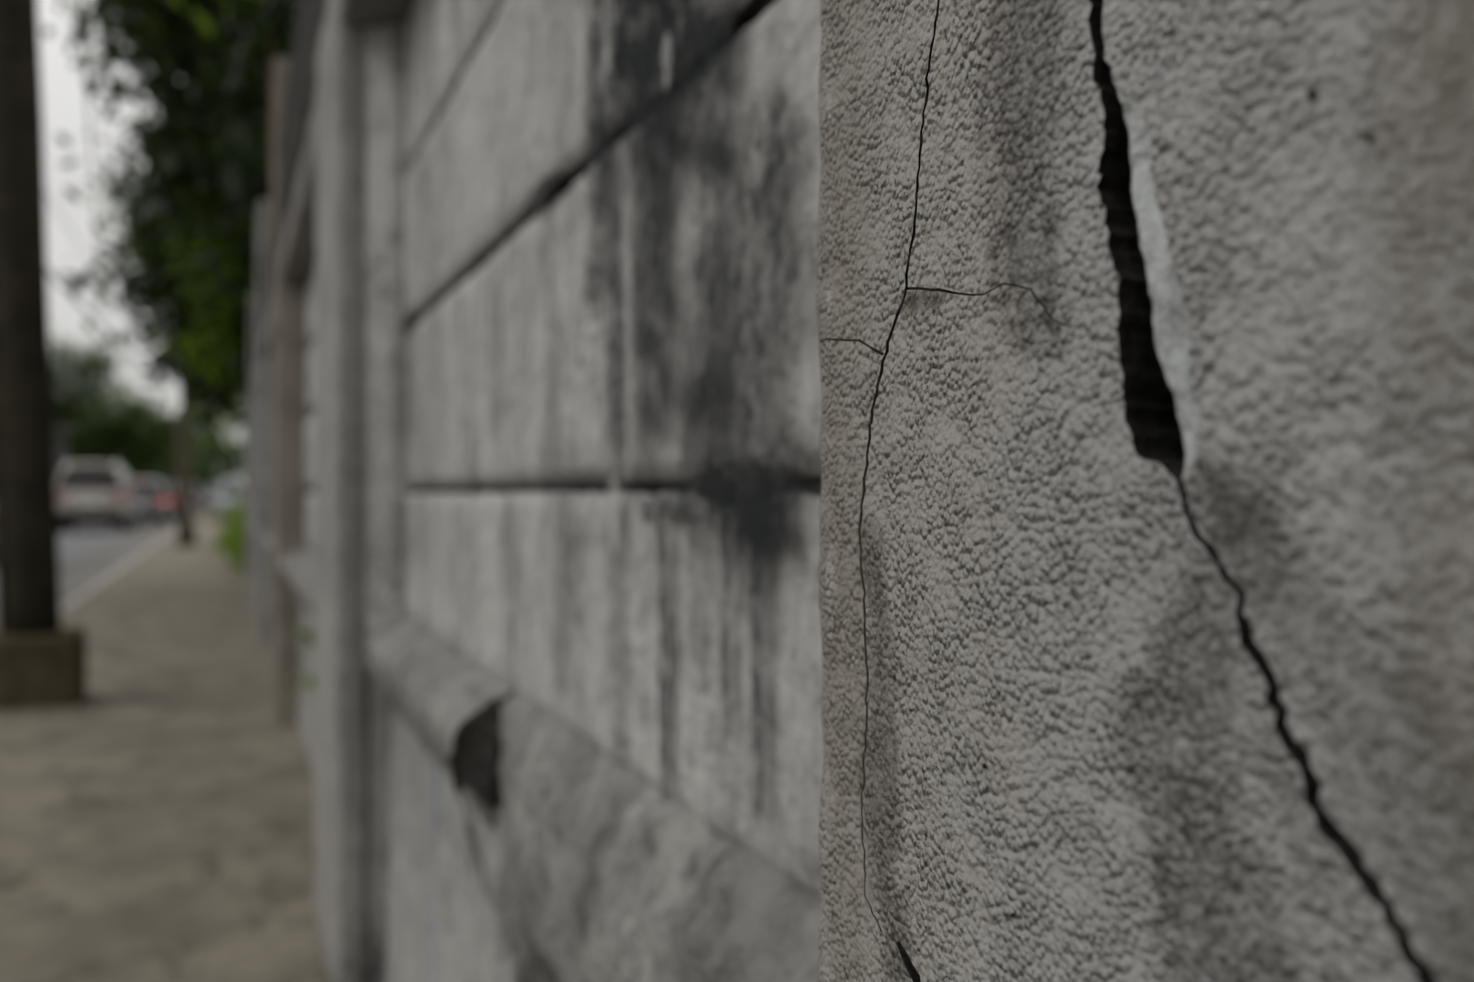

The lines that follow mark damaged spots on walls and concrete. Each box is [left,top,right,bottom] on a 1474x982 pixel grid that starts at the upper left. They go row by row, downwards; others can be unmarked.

water stain [584,0,790,819]
crack [819,0,1072,982]
crack [1088,0,1438,982]